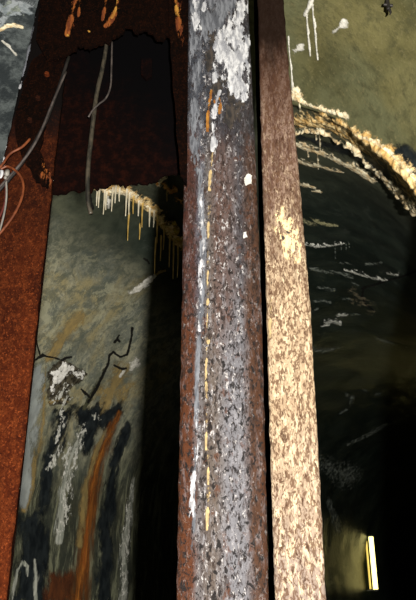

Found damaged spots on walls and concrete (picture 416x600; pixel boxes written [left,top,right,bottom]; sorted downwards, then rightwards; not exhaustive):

corrosion [65,0,81,37]
corrosion [101,0,118,28]
corrosion [175,0,183,40]
damp [292,3,318,60]
damp [291,93,416,217]
damp [94,185,183,295]
peeling [189,0,251,533]
crack [35,342,72,361]
spalling [47,360,87,407]
crack [80,327,134,410]
damp [11,311,141,600]
corrosion [43,411,121,600]